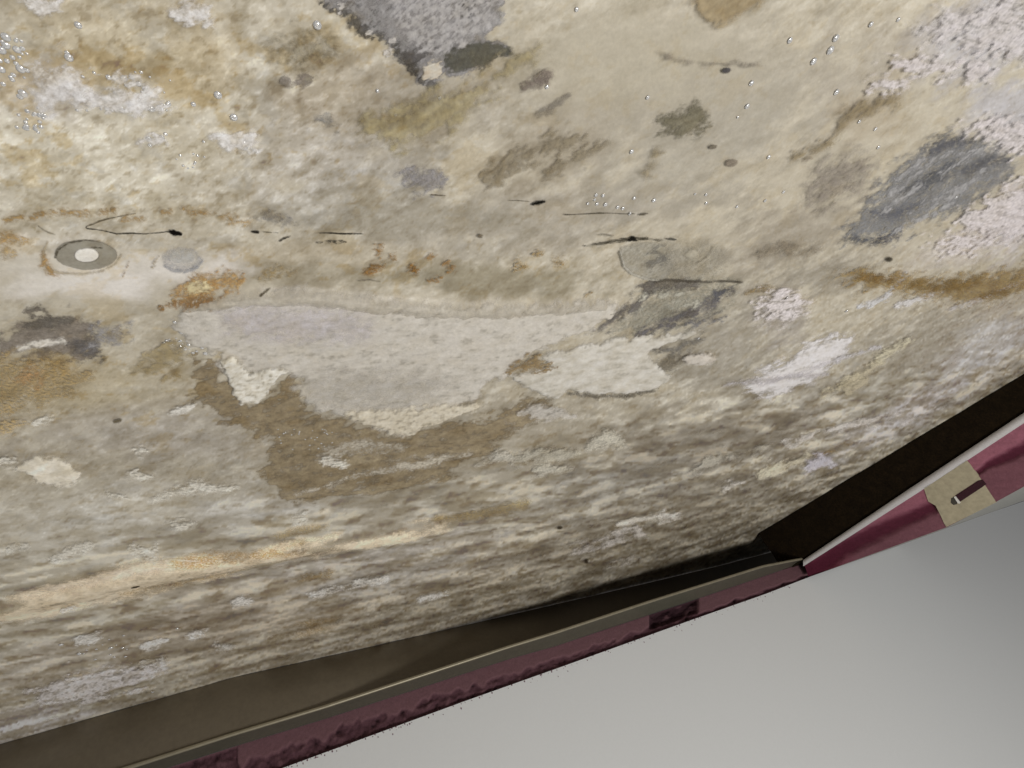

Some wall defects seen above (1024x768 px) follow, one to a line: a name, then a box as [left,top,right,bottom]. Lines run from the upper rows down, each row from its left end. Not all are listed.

damp [319,0,553,155]
damp [794,0,1024,259]
crack [86,216,182,236]
crack [565,213,677,246]
rust [158,270,245,311]
efflorescence [750,287,813,325]
rust [837,265,1024,307]
mould [0,307,130,363]
peeling [682,353,716,366]
peeling [171,287,700,511]
efflorescence [758,433,837,480]
efflorescence [574,510,680,555]